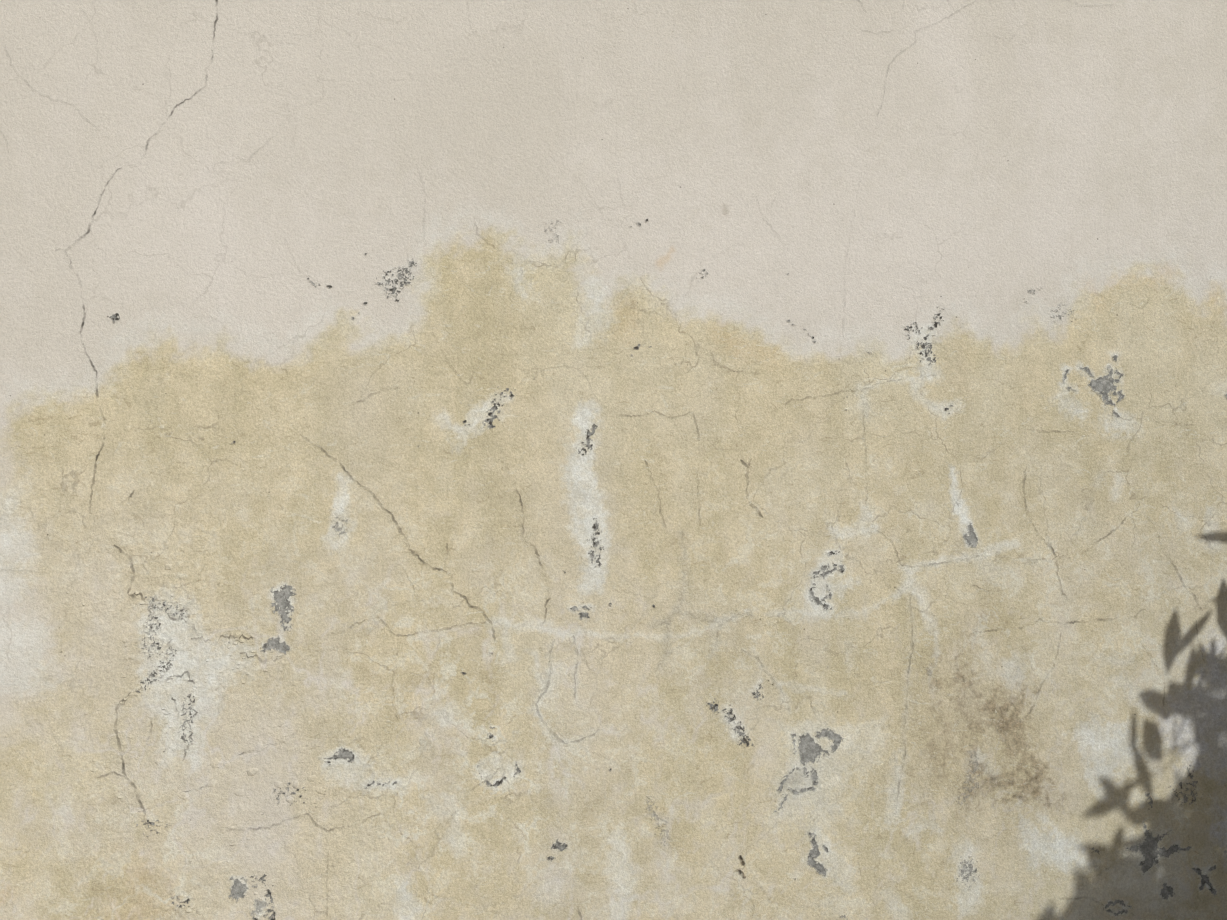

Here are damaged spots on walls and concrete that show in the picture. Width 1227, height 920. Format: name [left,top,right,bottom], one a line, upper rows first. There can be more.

crack [857,0,976,116]
crack [55,0,219,514]
peeling [351,258,419,321]
peeling [576,423,598,456]
spalling [1056,344,1130,425]
crack [113,544,138,600]
crack [300,434,496,720]
damp [0,197,1227,920]
peeling [114,578,300,767]
peeling [705,697,755,747]
spalling [767,720,851,883]
spalling [1124,790,1218,902]